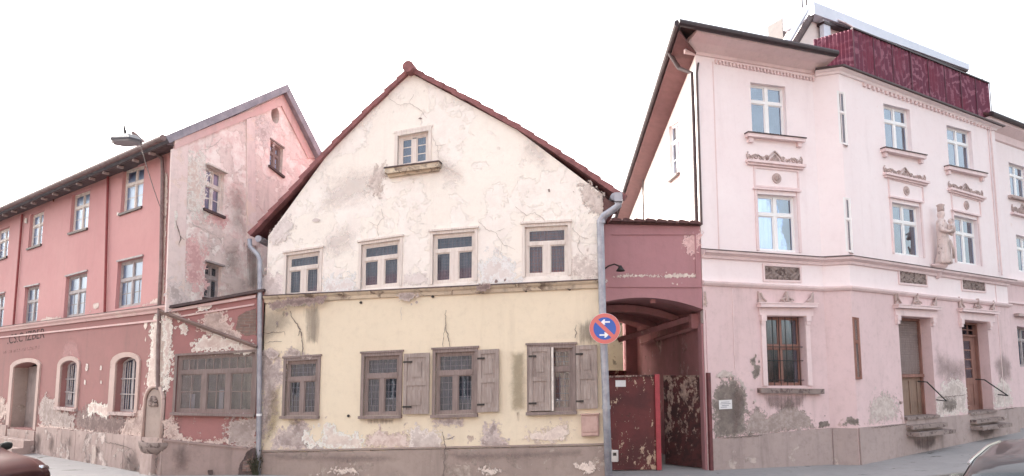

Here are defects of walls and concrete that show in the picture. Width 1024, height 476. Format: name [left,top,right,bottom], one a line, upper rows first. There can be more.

peeling [573,180,605,218]
spalling [38,146,313,436]
crack [263,311,304,355]
spalling [712,354,830,438]
flaking render [162,413,463,475]
flaking render [480,417,575,448]